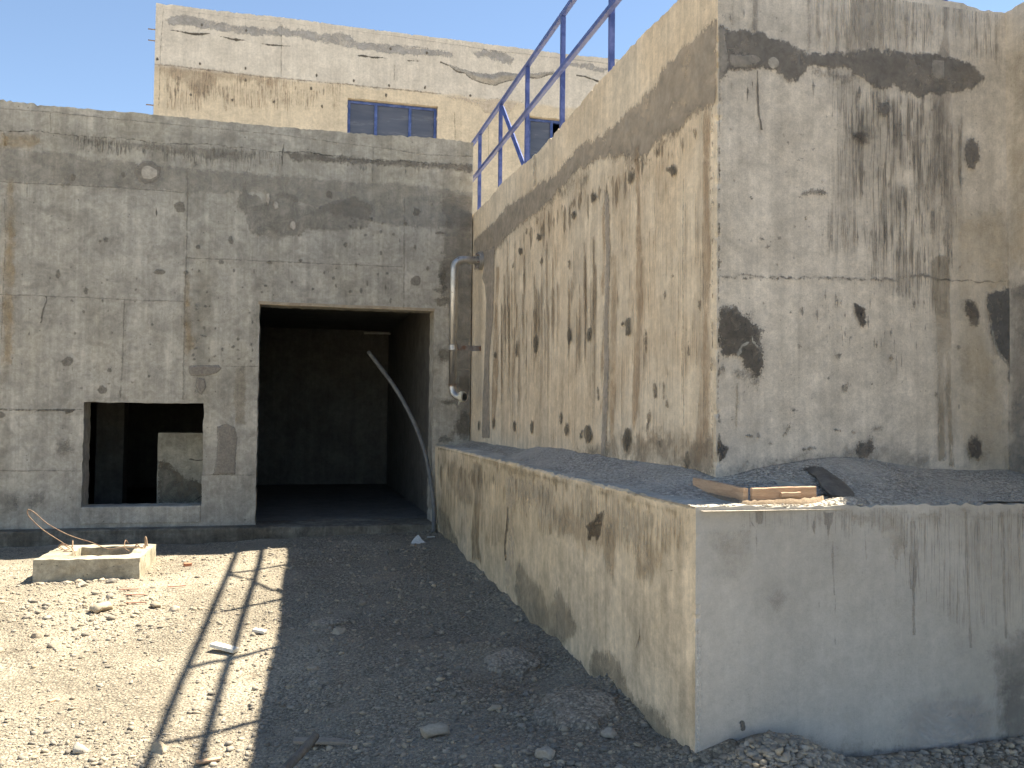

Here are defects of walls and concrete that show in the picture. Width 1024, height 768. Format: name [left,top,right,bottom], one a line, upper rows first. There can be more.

leakage [168,15,453,57]
leakage [443,19,985,466]